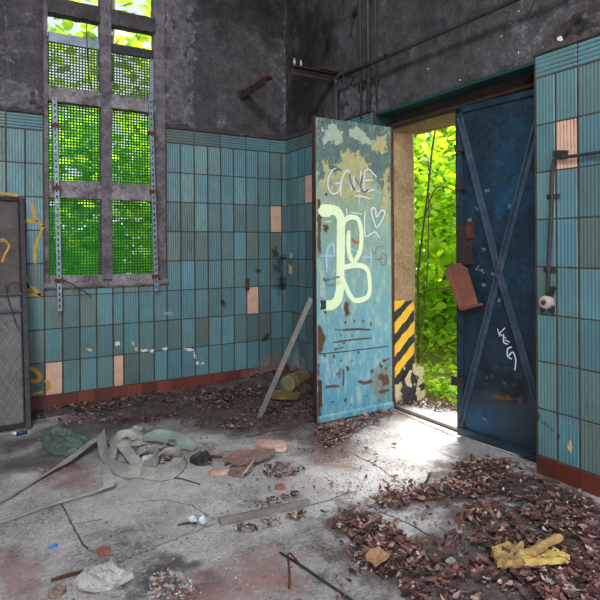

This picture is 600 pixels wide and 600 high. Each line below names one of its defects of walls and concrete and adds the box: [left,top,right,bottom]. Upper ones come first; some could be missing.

peeling [317,84,391,220]
rust [318,302,372,419]
rust [358,358,390,401]
peeling [395,364,427,405]
crack [61,504,101,551]
crack [120,500,218,562]